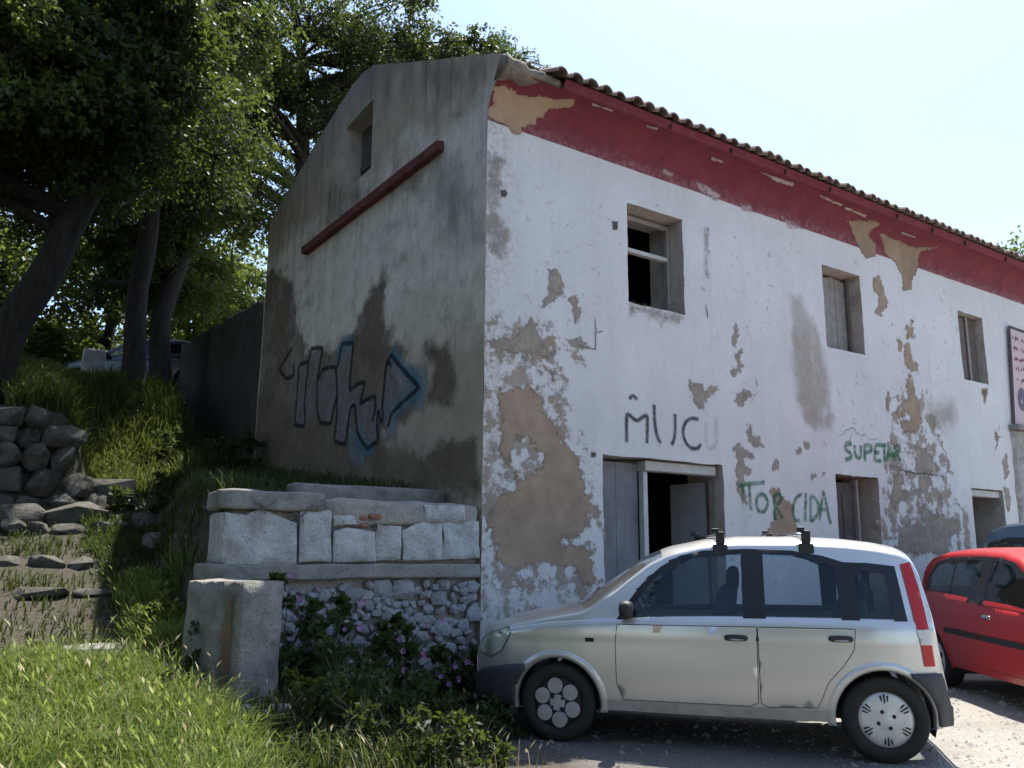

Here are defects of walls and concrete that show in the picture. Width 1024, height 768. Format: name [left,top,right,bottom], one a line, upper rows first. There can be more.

flaking render [488,85,575,135]
flaking render [820,195,937,291]
flaking render [873,275,888,316]
leakage [255,269,480,498]
flaking render [689,380,718,409]
flaking render [731,323,745,377]
flaking render [734,389,755,407]
leakage [793,302,831,427]
flaking render [481,269,606,618]
flaking render [732,424,764,505]
flaking render [875,320,971,558]